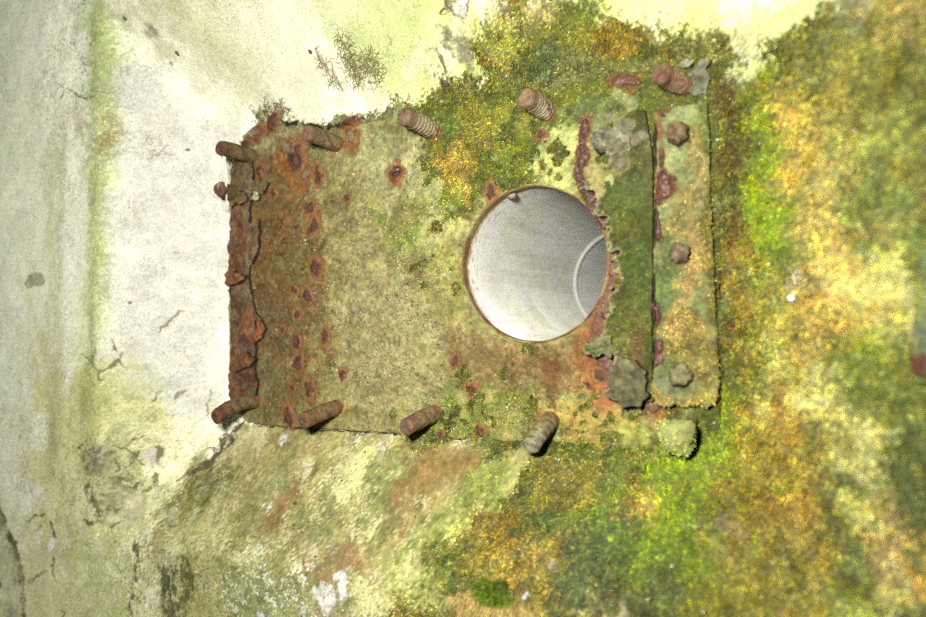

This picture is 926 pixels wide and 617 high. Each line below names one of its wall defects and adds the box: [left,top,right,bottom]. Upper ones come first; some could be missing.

rust [229,134,351,239]
rust [659,148,673,199]
rust [224,271,249,286]
rust [573,118,620,340]
peeling [583,109,654,407]
crack [82,338,125,381]
rust [230,312,268,373]
rust [280,252,325,430]
rust [320,324,336,358]
rust [338,366,348,383]
rust [576,354,614,414]
crack [0,508,57,617]